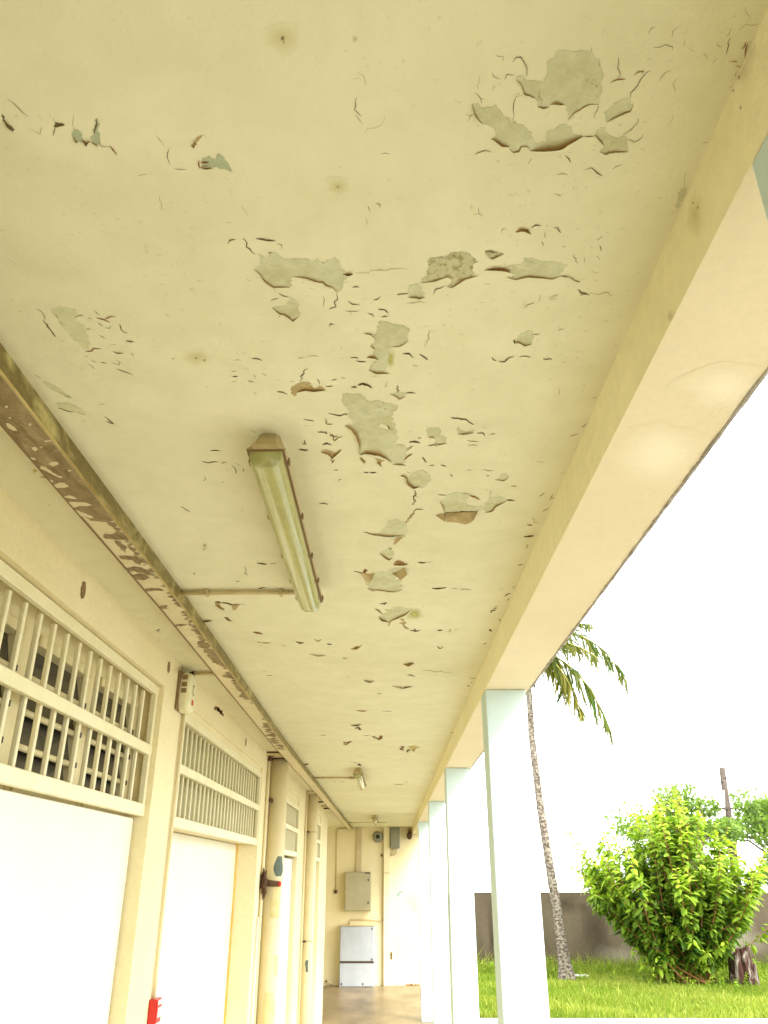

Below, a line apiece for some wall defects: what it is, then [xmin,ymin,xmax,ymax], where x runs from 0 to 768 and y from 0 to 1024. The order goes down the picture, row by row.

peeling [53,116,100,148]
peeling [191,135,233,172]
peeling [468,49,650,165]
peeling [228,238,353,323]
peeling [397,250,580,303]
peeling [51,306,90,349]
peeling [280,369,332,396]
peeling [303,309,493,630]
peeling [436,470,517,525]
peeling [0,375,253,704]